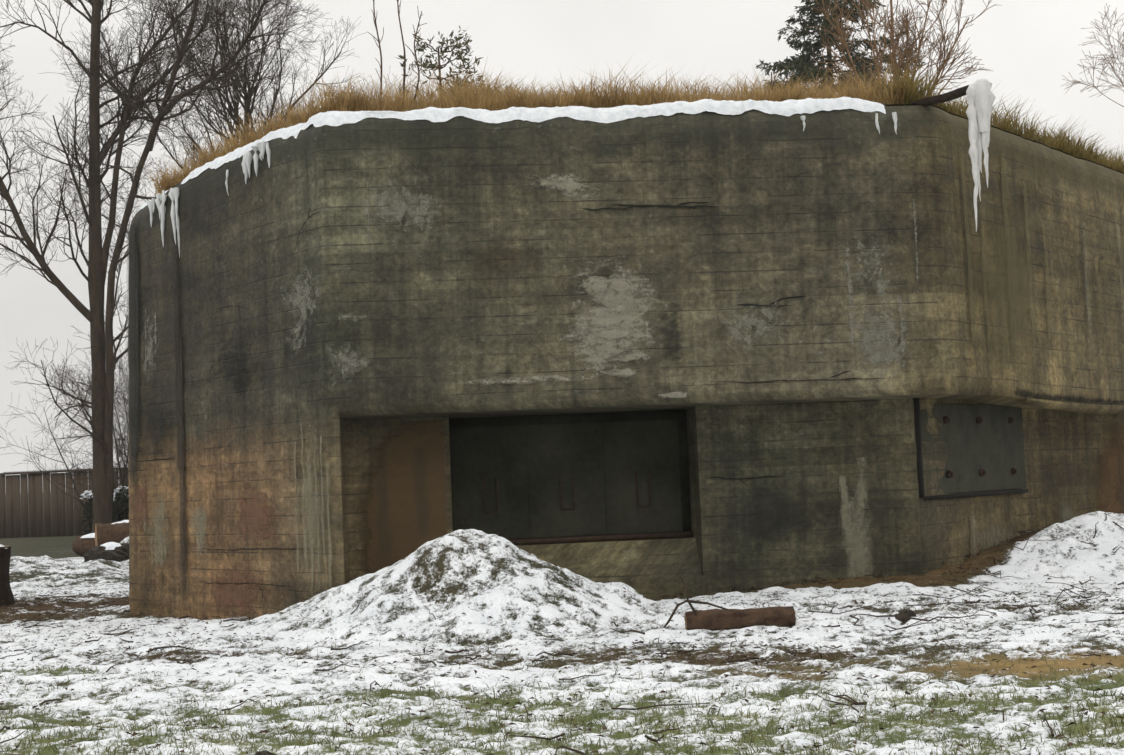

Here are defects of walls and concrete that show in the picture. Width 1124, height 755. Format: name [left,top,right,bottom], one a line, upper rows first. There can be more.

crack [582,202,716,211]
peeling [560,259,668,377]
damp [839,457,872,578]